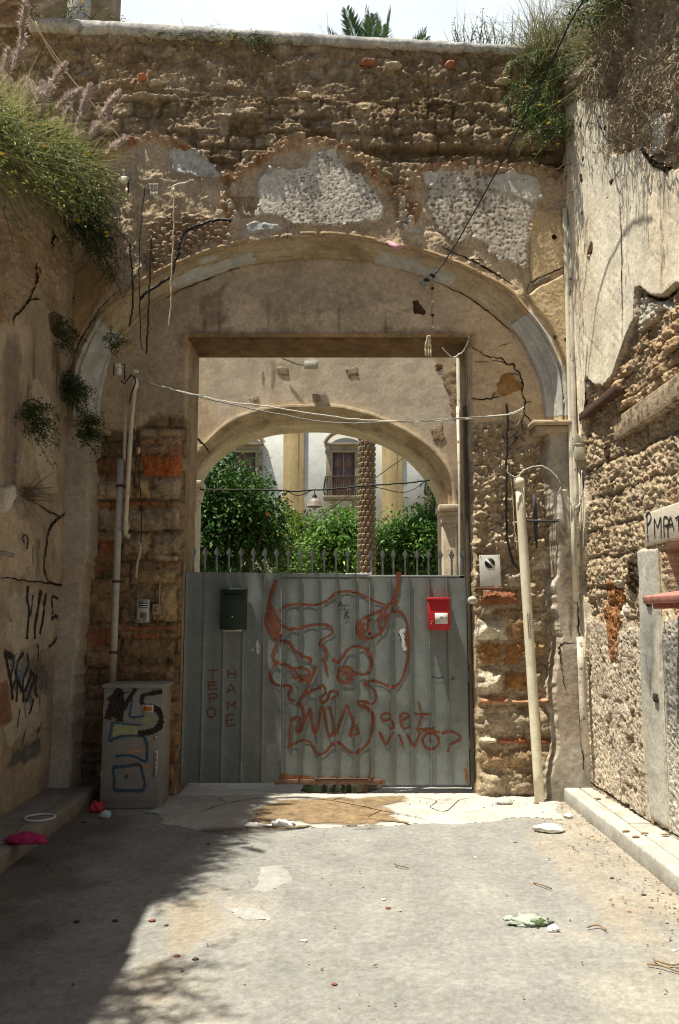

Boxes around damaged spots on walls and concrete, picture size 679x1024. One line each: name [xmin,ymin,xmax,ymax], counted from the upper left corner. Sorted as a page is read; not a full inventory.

peeling [168,145,385,234]
crack [640,148,672,174]
crack [13,230,59,325]
peeling [167,251,256,288]
peeling [374,252,457,286]
peeling [398,165,568,417]
crack [442,284,532,429]
crack [442,247,587,311]
peeling [638,296,675,333]
flaking render [603,551,639,639]
peeling [544,664,558,737]
crack [558,602,679,837]